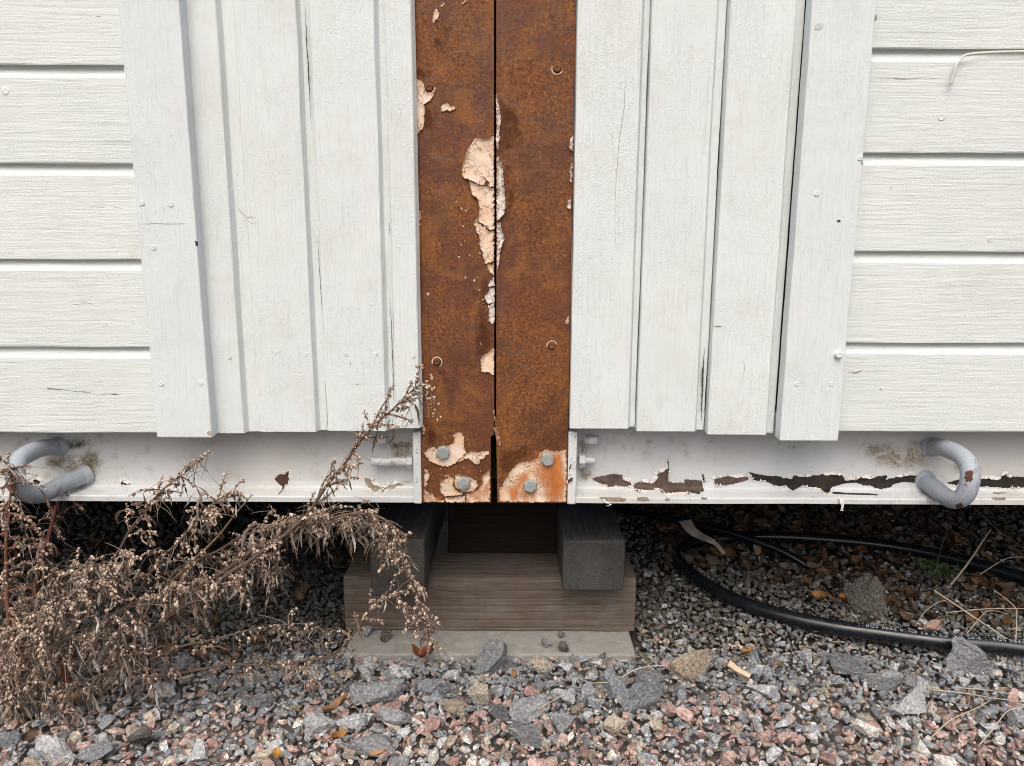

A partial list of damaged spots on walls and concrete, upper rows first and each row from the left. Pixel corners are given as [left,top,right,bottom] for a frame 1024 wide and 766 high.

peeling [416,79,455,134]
peeling [455,94,506,324]
peeling [480,343,494,375]
peeling [275,470,292,493]
peeling [423,410,573,503]
rust [510,454,564,499]
peeling [592,461,918,511]
peeling [948,470,1024,500]